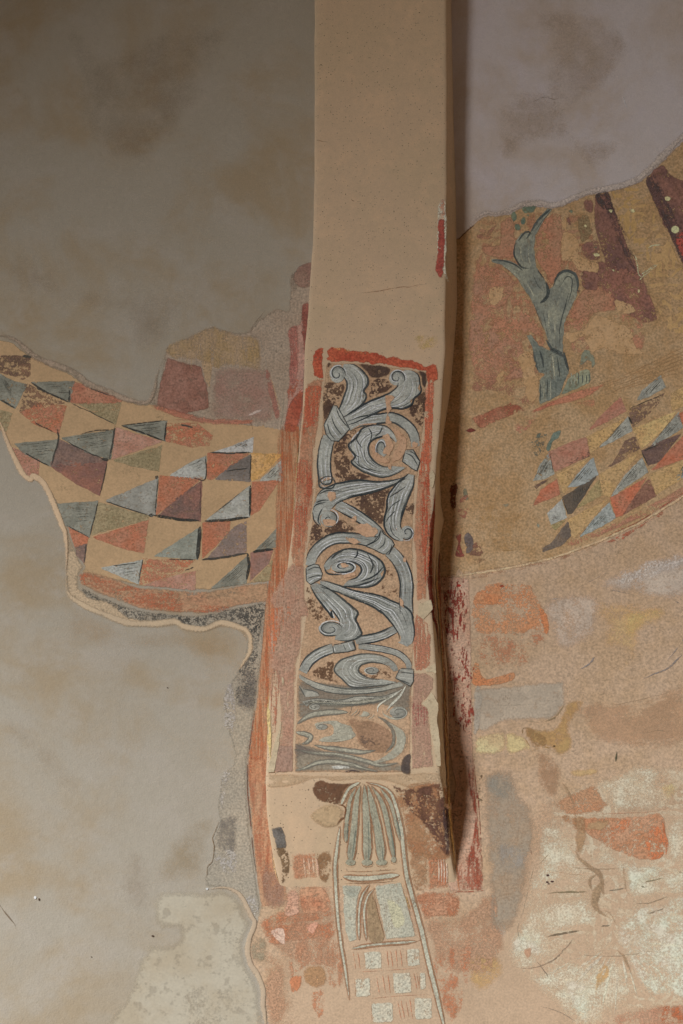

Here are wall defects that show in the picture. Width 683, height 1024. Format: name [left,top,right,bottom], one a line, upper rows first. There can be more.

flaking render [64,524,173,622]
flaking render [205,614,265,916]